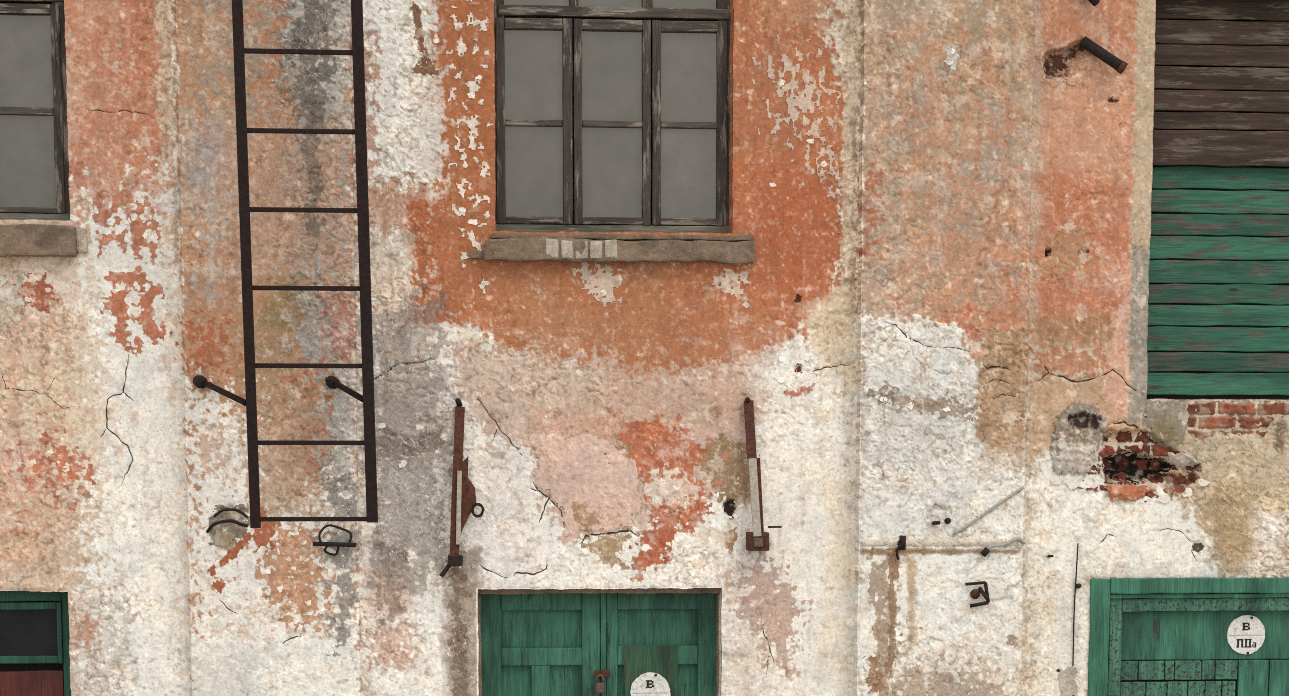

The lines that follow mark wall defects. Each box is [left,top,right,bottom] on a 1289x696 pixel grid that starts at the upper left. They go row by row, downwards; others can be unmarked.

peeling [402,0,493,268]
peeling [752,34,851,198]
peeling [572,262,623,306]
peeling [712,268,751,308]
crack [1,371,75,408]
crack [100,350,133,488]
spalling [769,345,817,398]
crack [889,323,1136,399]
crack [1108,420,1155,444]
spalling [1050,400,1289,503]
peeling [581,413,760,582]